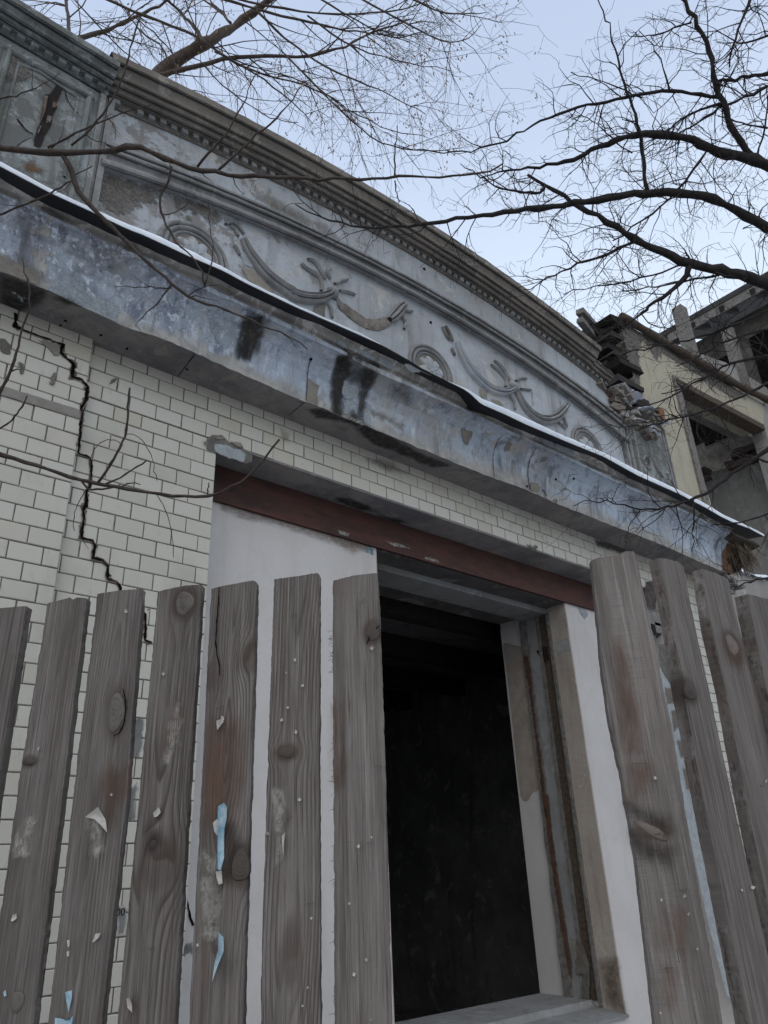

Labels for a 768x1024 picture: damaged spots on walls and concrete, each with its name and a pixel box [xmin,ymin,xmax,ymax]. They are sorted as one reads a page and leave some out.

spalling [34,85,63,147]
leakage [236,315,263,361]
leakage [310,350,448,467]
spalling [596,381,671,441]
crack [12,312,122,591]
spalling [204,435,253,464]
crack [143,612,152,644]
corrosion [523,656,572,981]